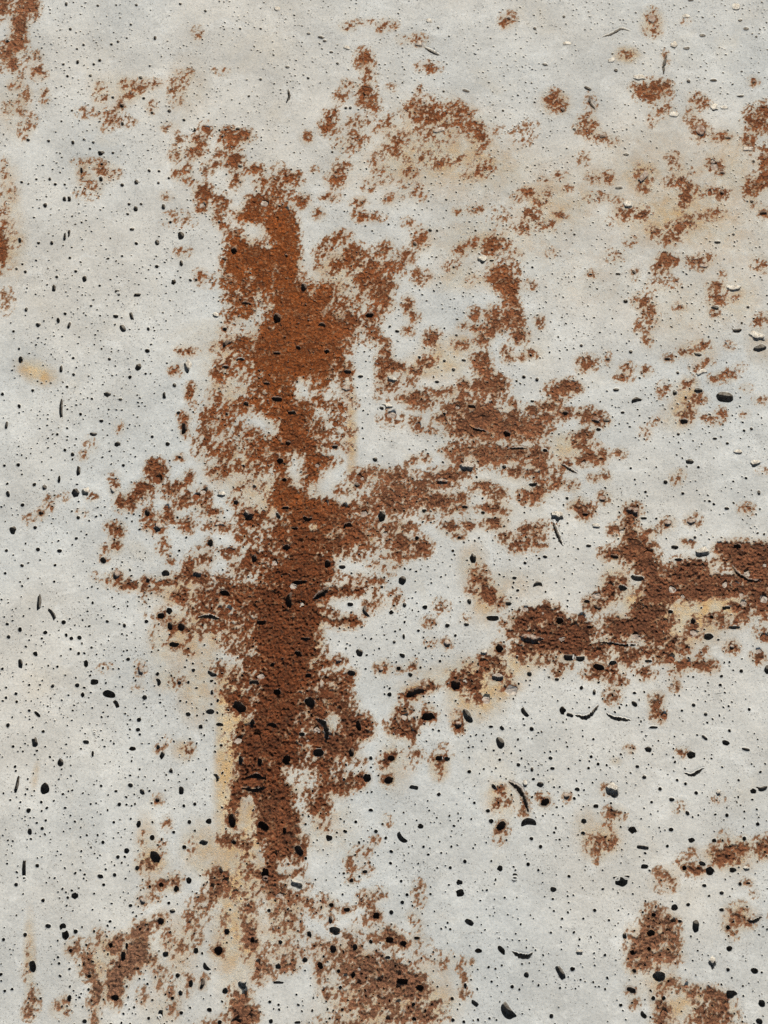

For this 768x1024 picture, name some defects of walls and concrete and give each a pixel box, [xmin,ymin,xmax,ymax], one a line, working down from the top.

corrosion [0,0,50,141]
corrosion [68,67,195,134]
corrosion [310,45,541,223]
corrosion [541,86,570,115]
corrosion [627,76,675,129]
corrosion [0,159,23,317]
corrosion [571,90,768,348]
corrosion [612,361,654,382]
corrosion [655,339,767,427]
corrosion [64,120,629,1024]
corrosion [382,500,768,782]
corrosion [622,829,768,1024]